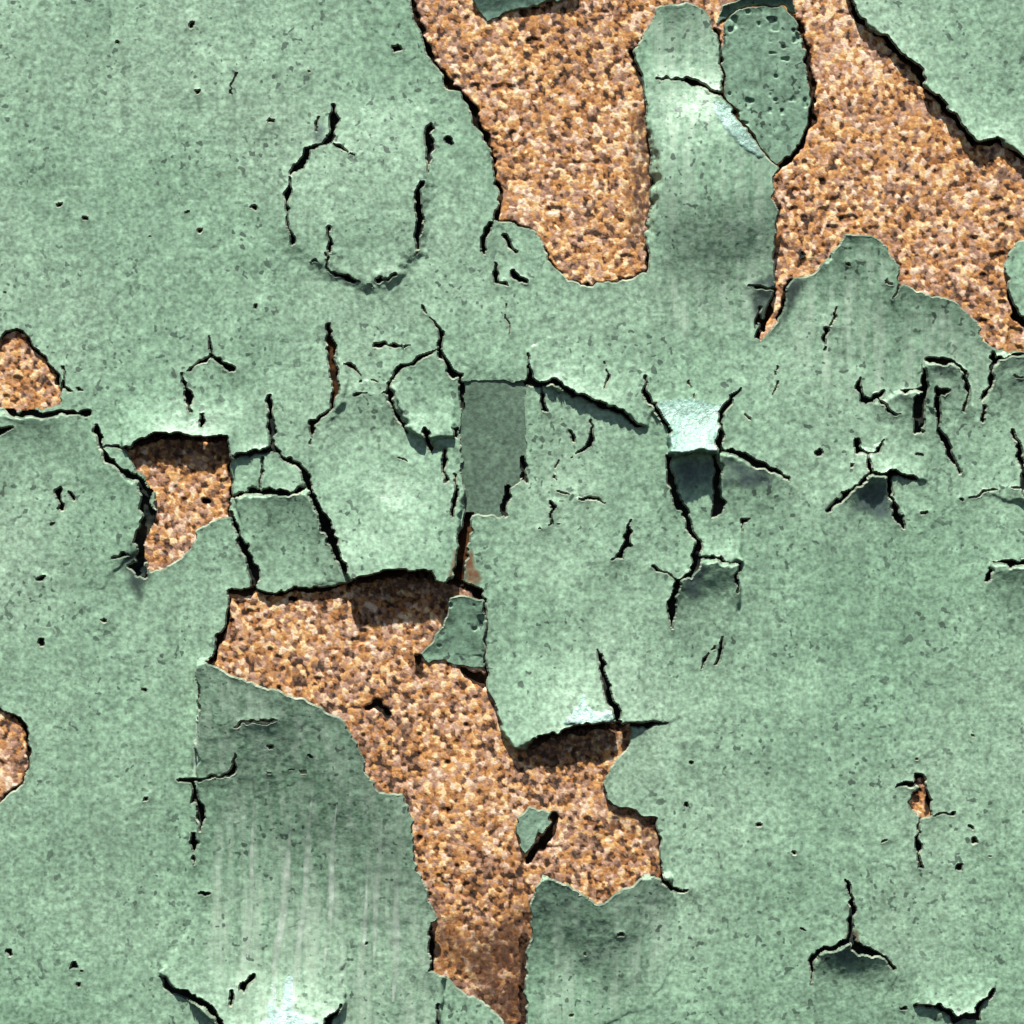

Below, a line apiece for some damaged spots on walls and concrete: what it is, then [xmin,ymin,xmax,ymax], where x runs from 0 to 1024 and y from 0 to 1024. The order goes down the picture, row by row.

crack [284,105,346,245]
crack [415,124,434,249]
peeling [411,0,1024,556]
peeling [0,329,64,412]
crack [230,324,359,585]
crack [374,306,474,581]
crack [523,366,789,627]
crack [826,439,917,529]
crack [856,353,1024,474]
peeling [120,321,796,1024]
peeling [0,709,31,802]
peeling [908,774,931,818]